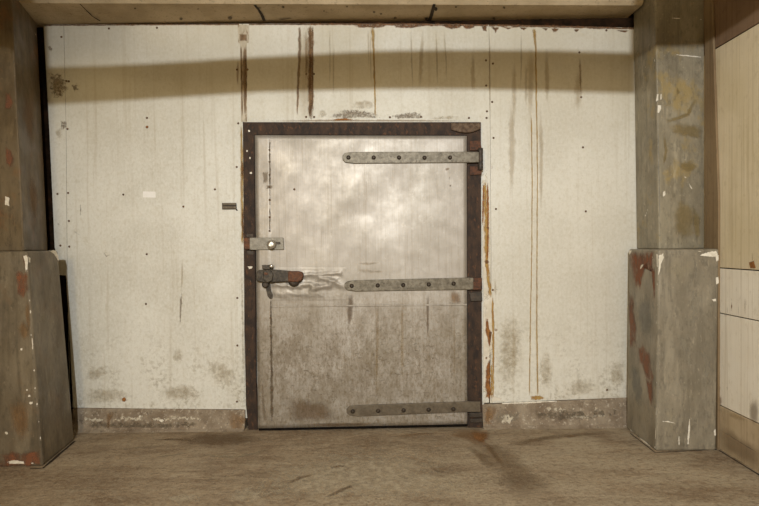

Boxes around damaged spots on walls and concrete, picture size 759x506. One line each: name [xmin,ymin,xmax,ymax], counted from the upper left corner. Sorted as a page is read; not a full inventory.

corrosion [249,23,634,400]